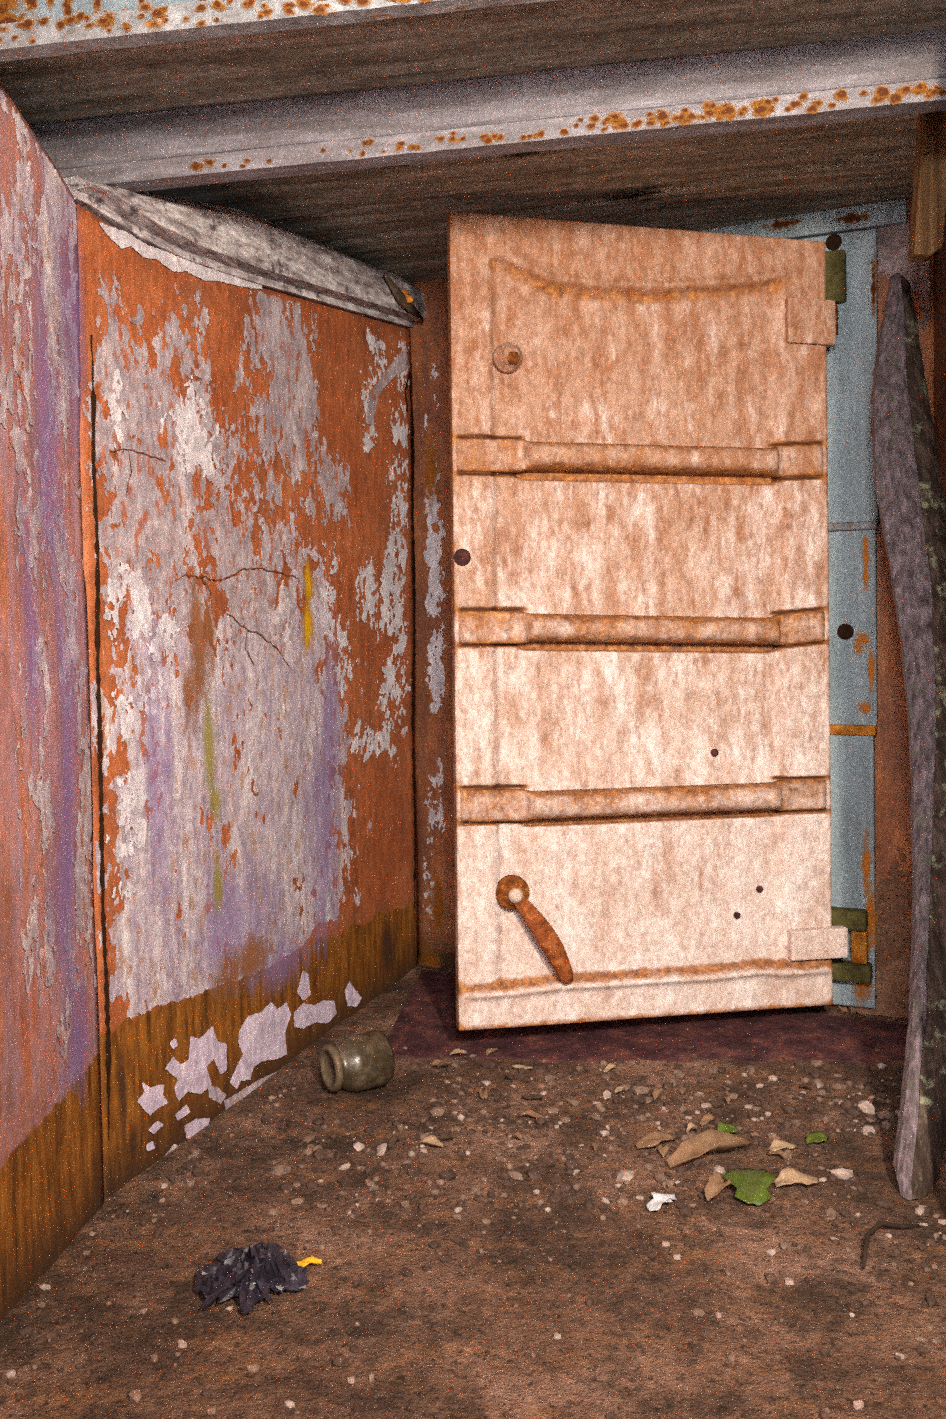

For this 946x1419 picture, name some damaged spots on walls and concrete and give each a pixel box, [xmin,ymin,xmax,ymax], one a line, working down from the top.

rust [0,0,371,44]
rust [349,82,946,157]
rust [190,158,272,171]
peeling [0,89,447,1060]
peeling [138,971,362,1156]